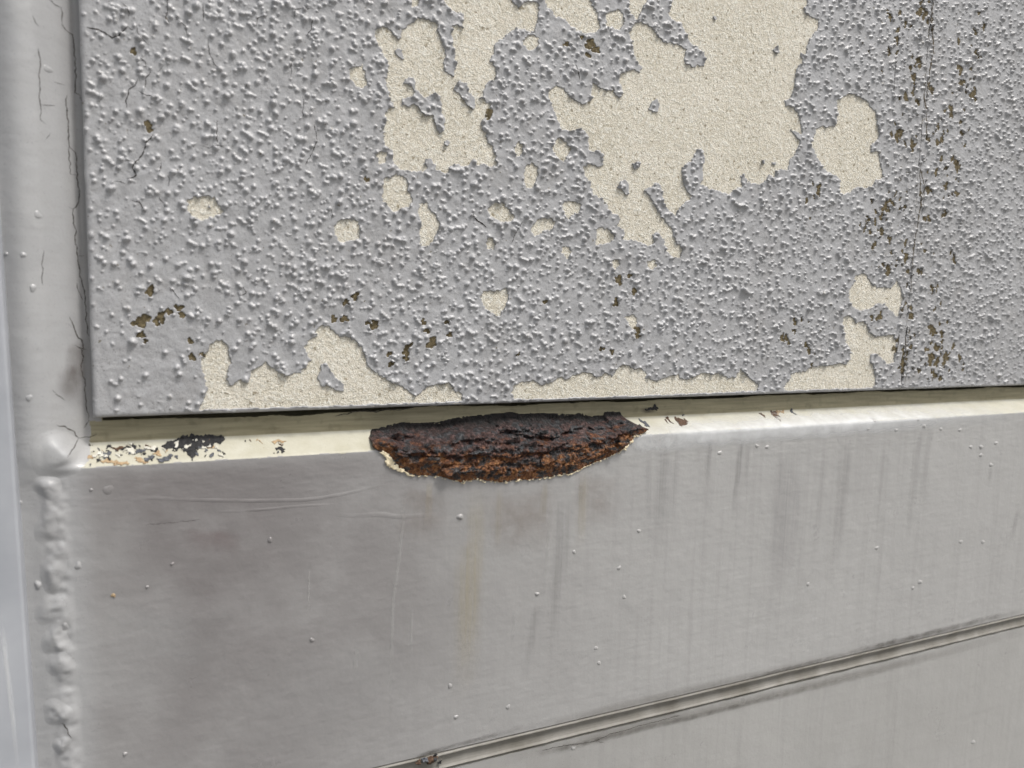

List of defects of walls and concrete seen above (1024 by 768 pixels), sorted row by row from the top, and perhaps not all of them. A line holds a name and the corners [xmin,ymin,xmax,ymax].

peeling [349,64,367,88]
crack [33,0,170,456]
peeling [187,196,224,221]
peeling [334,219,360,242]
peeling [375,0,989,391]
crack [897,0,935,384]
spalling [130,304,186,344]
peeling [188,292,463,410]
peeling [511,365,758,400]
corrosion [369,404,688,484]